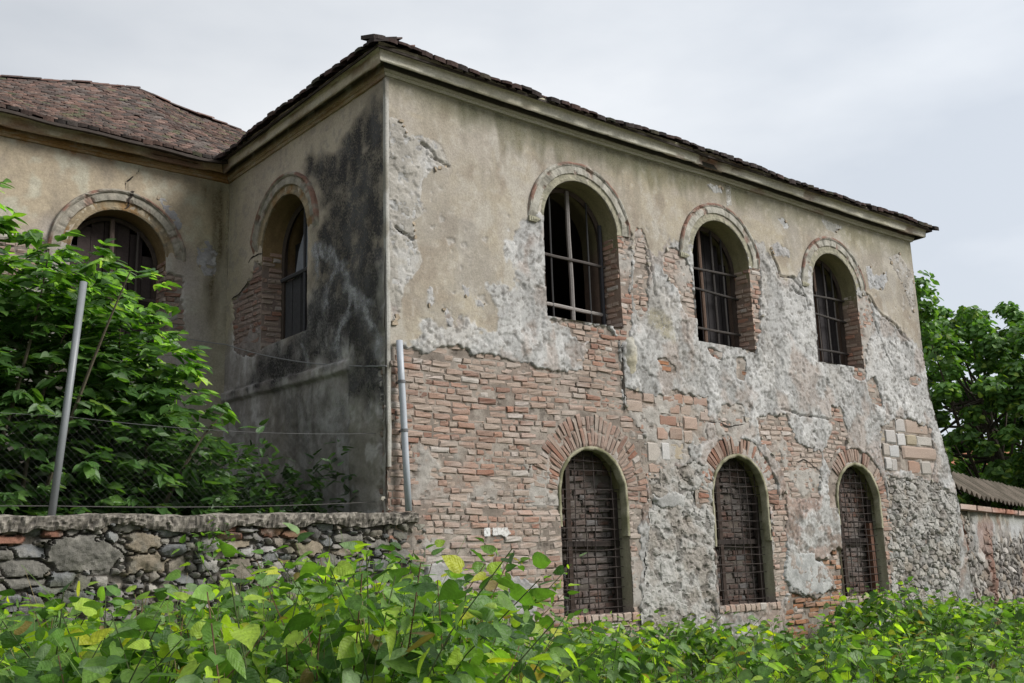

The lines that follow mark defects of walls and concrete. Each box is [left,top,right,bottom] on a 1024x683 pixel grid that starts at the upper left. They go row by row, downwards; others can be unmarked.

flaking render [163,270,186,332]
flaking render [232,261,264,357]
damp [231,103,386,406]
peeling [389,117,450,325]
flaking render [853,252,915,407]
flaking render [379,228,850,654]
flaking render [880,417,936,483]
flaking render [881,498,896,593]